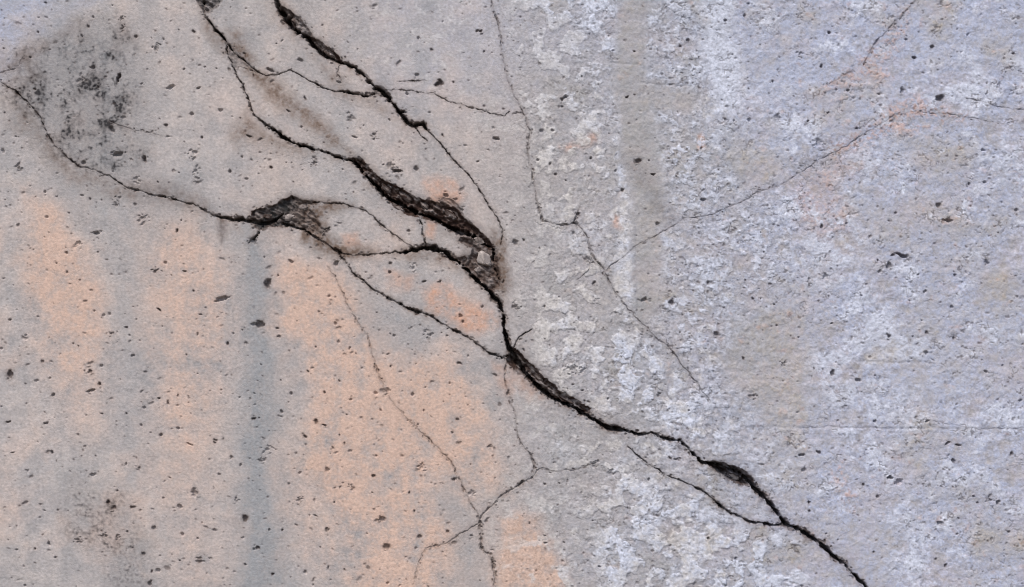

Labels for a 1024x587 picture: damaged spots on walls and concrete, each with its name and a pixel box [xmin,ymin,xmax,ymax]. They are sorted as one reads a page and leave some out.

crack [0,56,25,74]
crack [0,79,284,244]
crack [966,97,1024,111]
crack [202,0,1004,587]